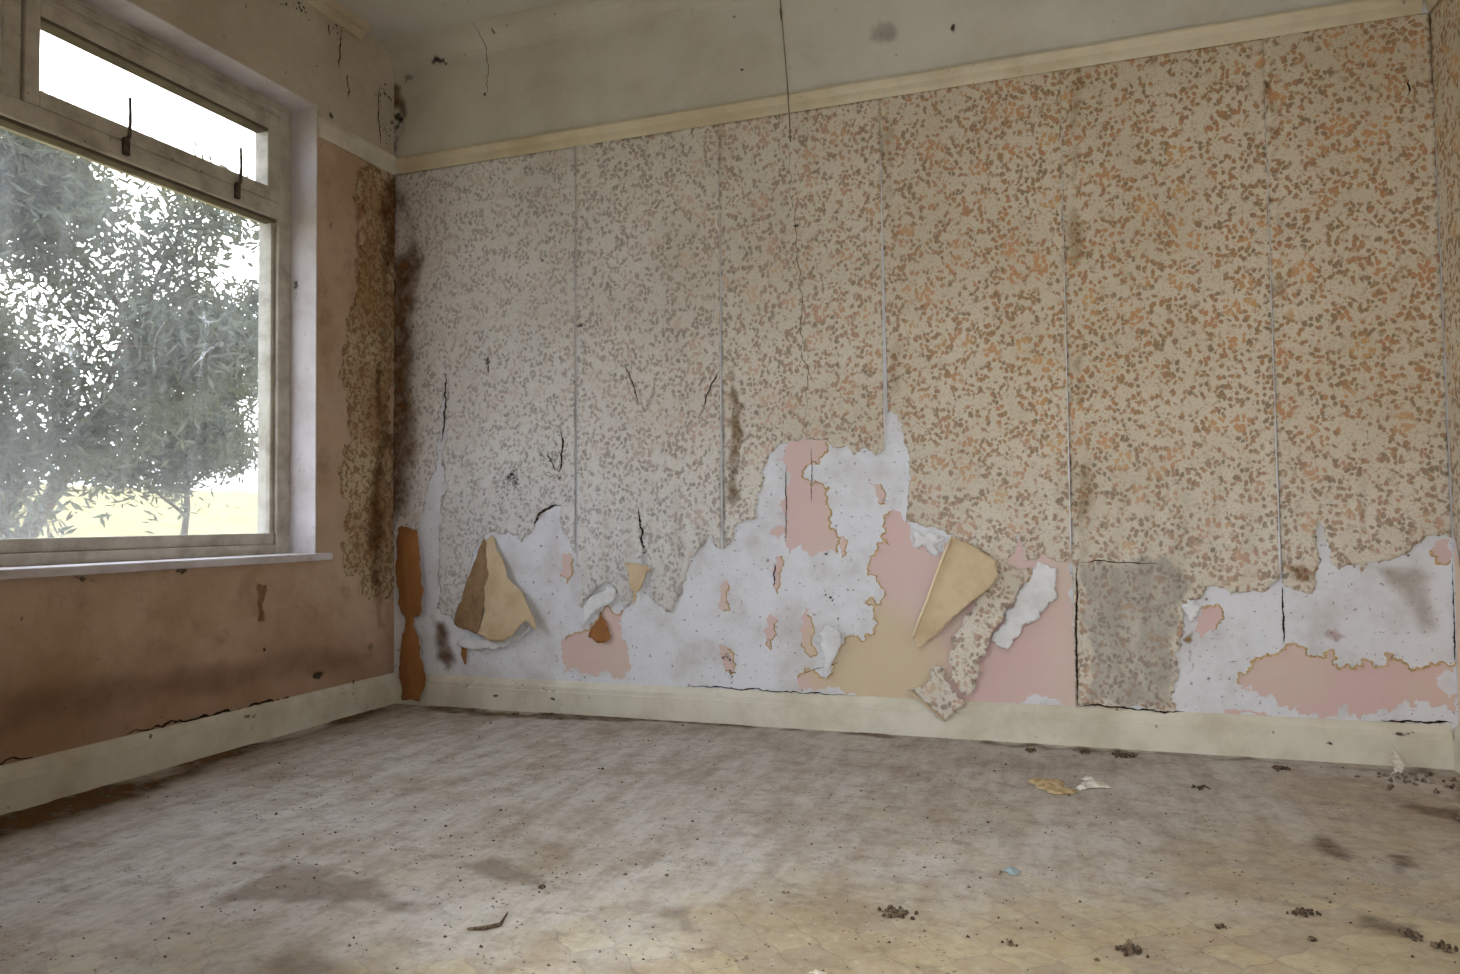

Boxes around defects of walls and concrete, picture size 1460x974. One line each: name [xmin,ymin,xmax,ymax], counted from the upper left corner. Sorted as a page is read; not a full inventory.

water stain [369,182,420,585]
peeling [770,438,848,594]
peeling [560,605,631,680]
peeling [718,580,730,612]
peeling [718,644,737,675]
peeling [763,614,778,651]
peeling [796,483,1076,706]
peeling [1195,603,1225,638]
peeling [1224,539,1460,733]